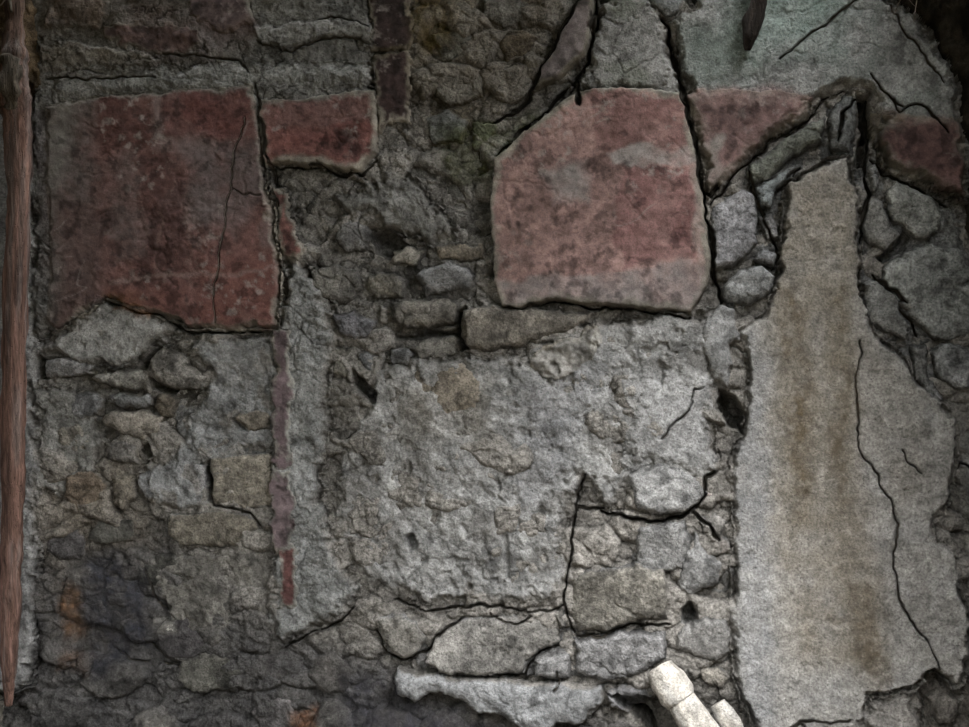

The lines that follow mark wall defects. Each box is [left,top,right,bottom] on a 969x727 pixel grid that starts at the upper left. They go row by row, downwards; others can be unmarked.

crack [47,74,155,82]
crack [110,53,378,334]
peeling [368,0,498,174]
spalling [464,0,537,63]
crack [660,19,949,305]
crack [780,0,857,59]
crack [887,4,944,83]
spalling [45,329,300,630]
crack [210,474,261,526]
crack [377,471,720,676]
crack [855,341,941,670]